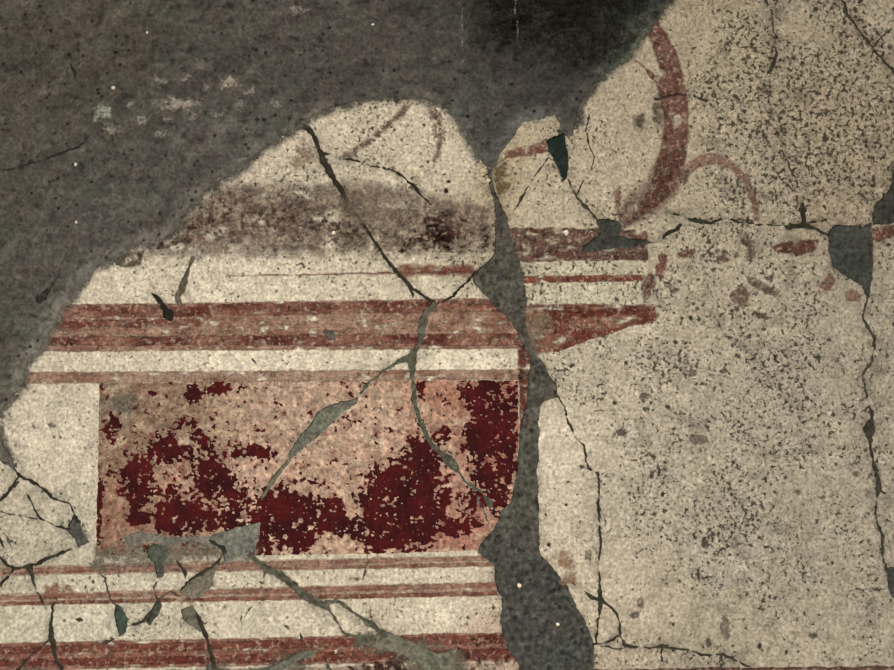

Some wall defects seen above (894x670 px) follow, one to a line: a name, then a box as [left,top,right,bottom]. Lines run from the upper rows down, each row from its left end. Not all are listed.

crack [0,472,79,670]
crack [92,539,389,670]
peeling [68,165,595,670]
crack [299,123,493,529]
spalling [547,133,569,181]
leakage [475,0,648,69]
spalling [581,219,653,252]
crack [556,395,751,667]
spalling [690,435,708,445]
crack [663,0,831,239]
crack [862,294,891,571]
spalling [886,567,894,599]